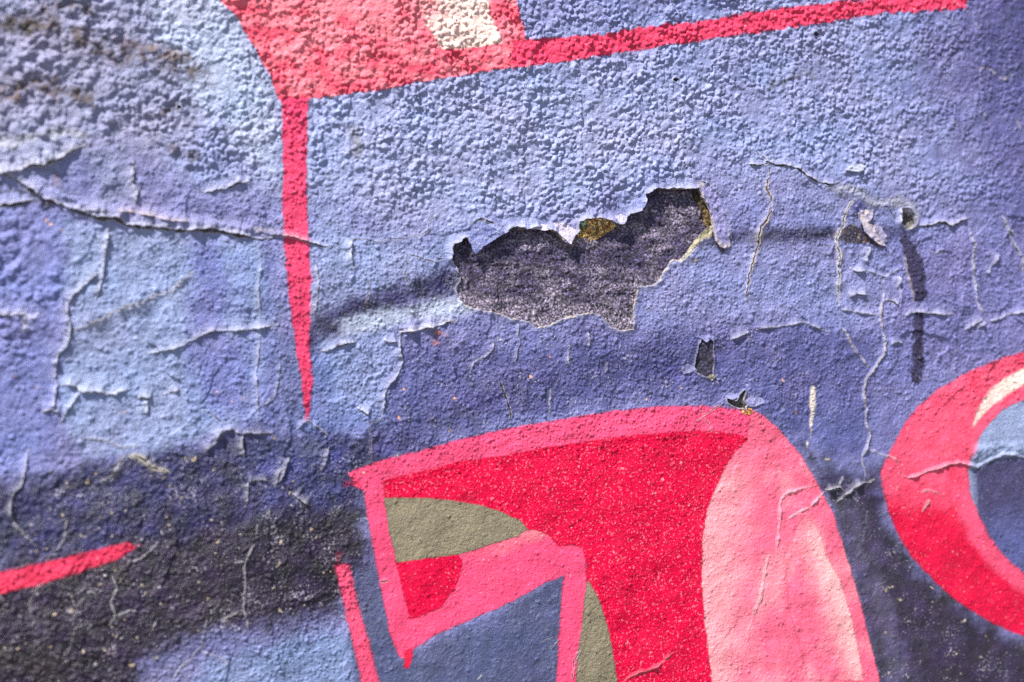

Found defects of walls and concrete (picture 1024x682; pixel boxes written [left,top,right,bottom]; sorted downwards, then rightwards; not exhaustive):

peeling [441,178,730,337]
peeling [838,199,888,247]
peeling [902,208,917,228]
crack [0,133,445,682]
peeling [680,335,717,389]
crack [696,150,1024,637]